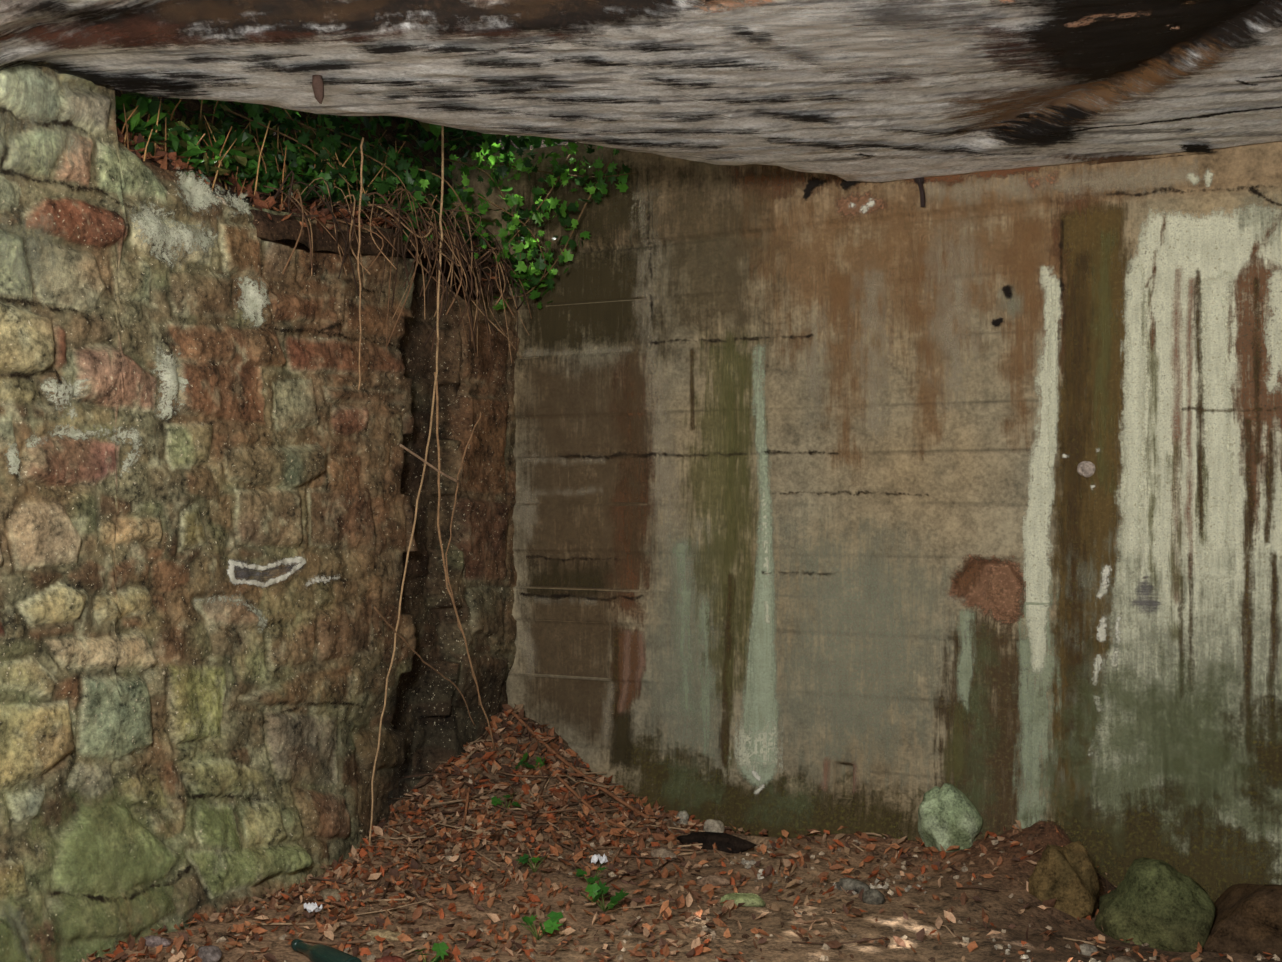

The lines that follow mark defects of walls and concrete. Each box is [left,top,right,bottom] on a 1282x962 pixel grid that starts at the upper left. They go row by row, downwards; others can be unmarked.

water stain [1067,11,1150,28]
water stain [0,0,1081,842]
water stain [1007,169,1282,885]
rust [1229,225,1282,752]